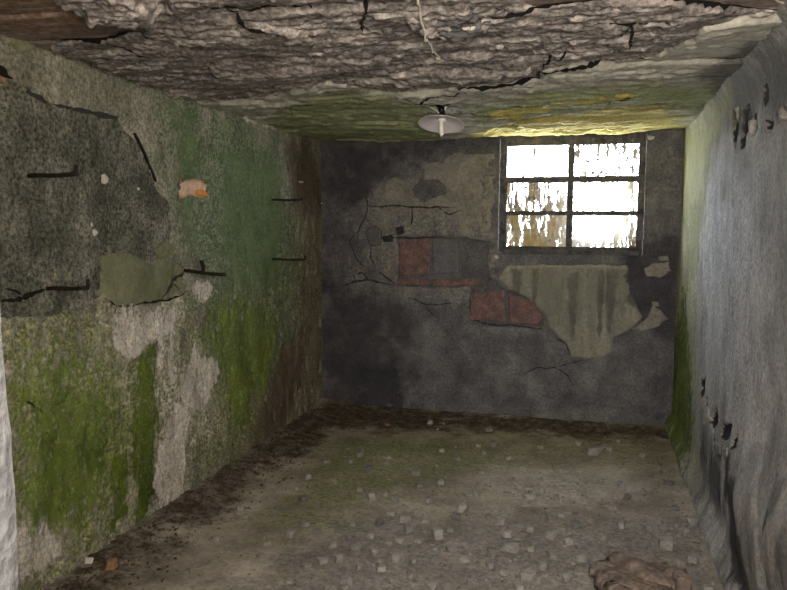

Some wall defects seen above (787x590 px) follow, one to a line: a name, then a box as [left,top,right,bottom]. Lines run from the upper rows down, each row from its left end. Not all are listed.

peeling [49,0,782,142]
spalling [733,104,787,149]
spalling [178,179,208,200]
crack [0,288,46,303]
crack [340,186,586,387]
peeling [365,152,671,359]
peeling [111,303,220,508]
spalling [701,377,738,459]
damp [111,449,155,531]